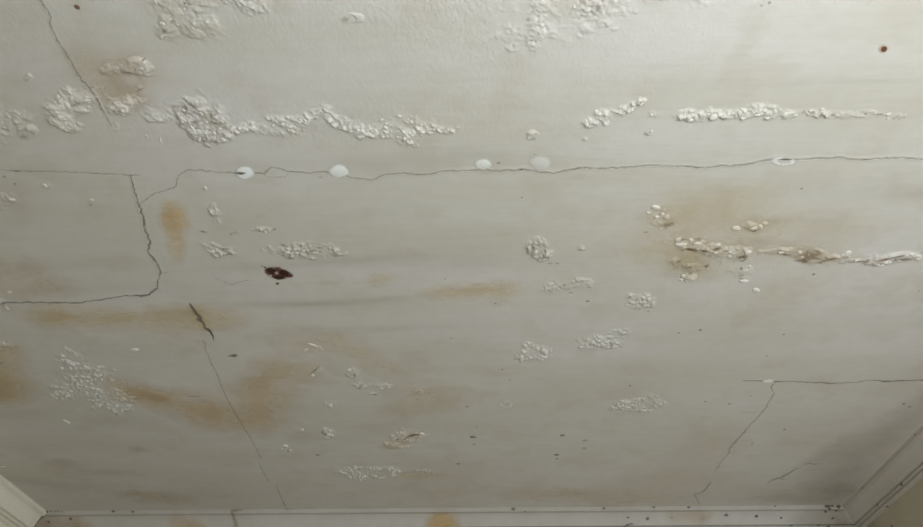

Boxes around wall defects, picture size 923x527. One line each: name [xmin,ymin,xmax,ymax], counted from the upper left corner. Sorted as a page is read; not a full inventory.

crack [37,0,113,127]
crack [252,153,923,182]
crack [0,174,165,307]
rust [264,267,293,285]
crack [187,302,217,340]